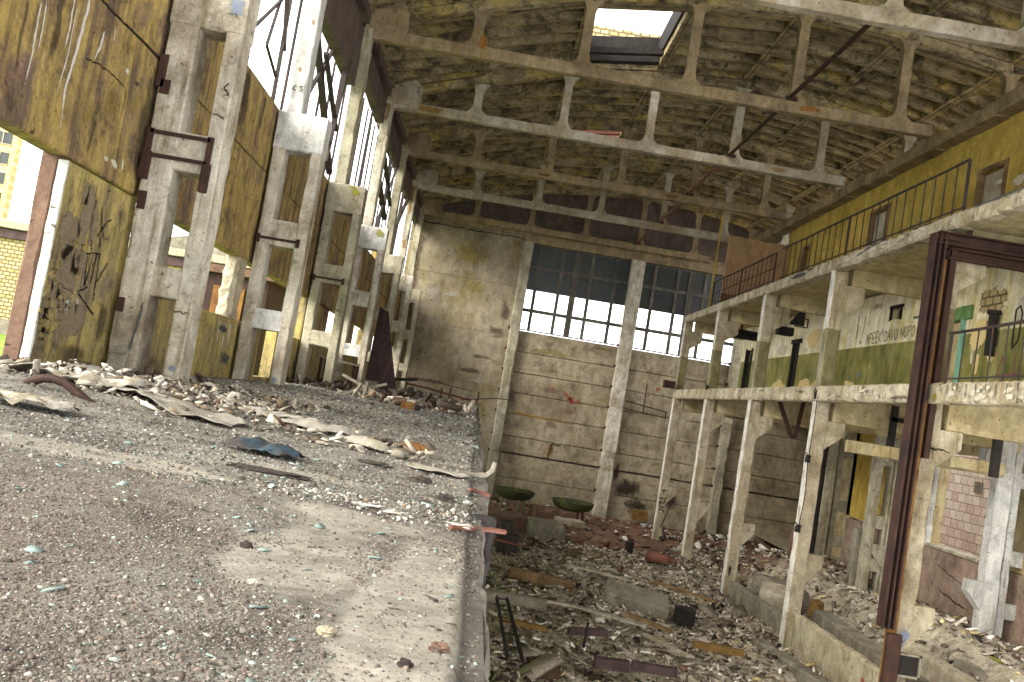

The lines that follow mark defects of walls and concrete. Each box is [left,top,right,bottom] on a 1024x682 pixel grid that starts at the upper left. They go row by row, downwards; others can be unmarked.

crack [86,58,126,125]
flaking render [31,183,98,363]
flaking render [969,285,1024,401]
crack [937,564,969,611]